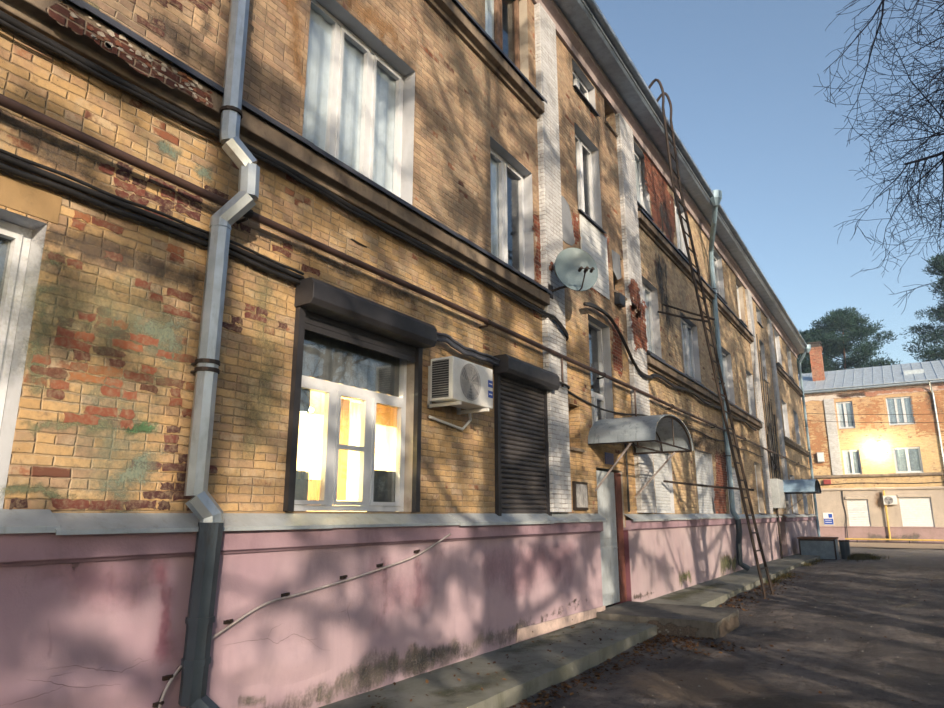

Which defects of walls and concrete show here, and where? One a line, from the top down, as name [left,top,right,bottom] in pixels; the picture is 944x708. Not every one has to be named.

spalling [46,0,213,108]
peeling [643,152,675,243]
spalling [612,278,648,377]
damp [317,599,587,700]